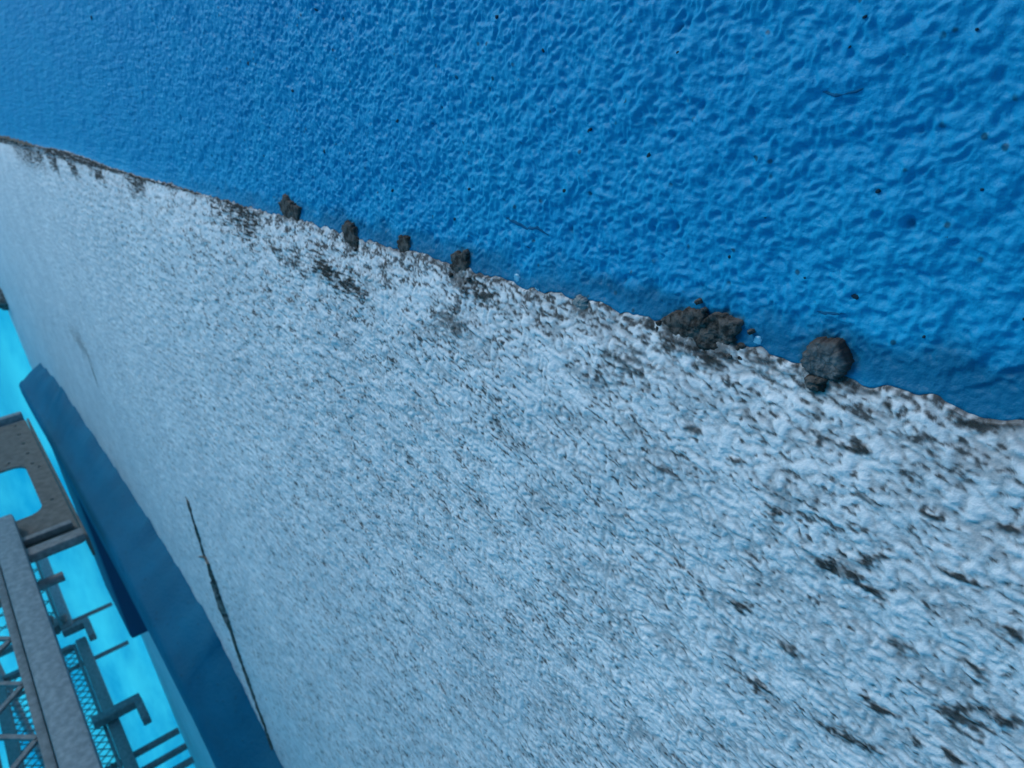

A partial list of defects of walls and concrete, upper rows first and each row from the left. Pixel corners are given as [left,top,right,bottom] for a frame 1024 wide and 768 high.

water stain [0,139,369,310]
water stain [435,280,502,338]
water stain [811,430,870,455]
water stain [998,523,1024,535]
water stain [815,552,888,607]
water stain [937,567,989,588]
crack [185,496,273,750]
water stain [996,624,1023,643]
water stain [817,722,881,755]
water stain [859,694,895,718]
water stain [938,700,1023,745]
water stain [941,747,966,765]